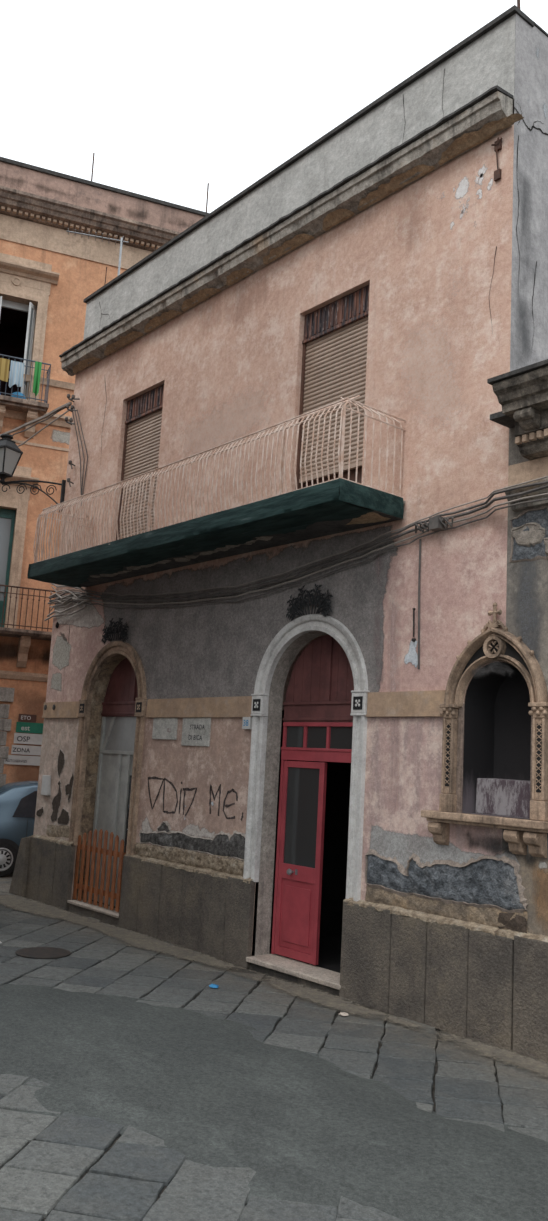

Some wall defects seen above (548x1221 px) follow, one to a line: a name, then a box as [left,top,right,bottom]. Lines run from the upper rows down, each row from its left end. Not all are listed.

crack [489,105,548,346]
spalling [509,505,548,563]
spalling [135,805,246,876]
spalling [365,825,528,933]